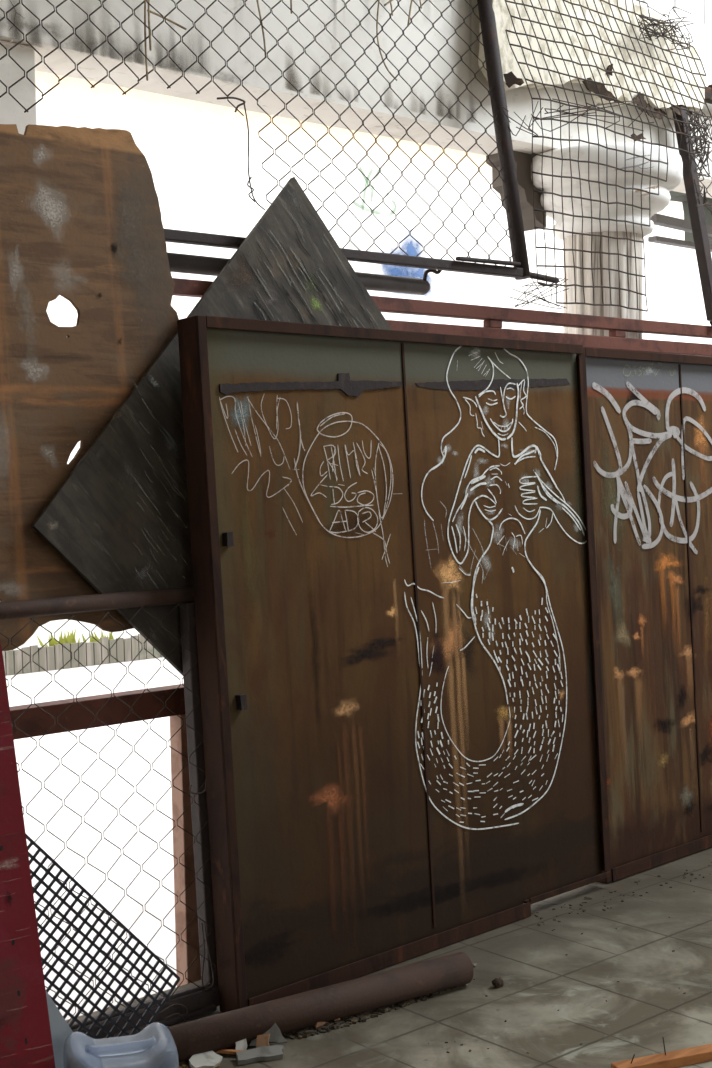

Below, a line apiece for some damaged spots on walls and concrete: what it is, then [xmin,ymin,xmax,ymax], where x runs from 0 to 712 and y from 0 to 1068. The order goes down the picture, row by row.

peeling [503,71,524,88]
peeling [582,64,693,132]
corrosion [660,556,681,604]
corrosion [615,668,641,714]